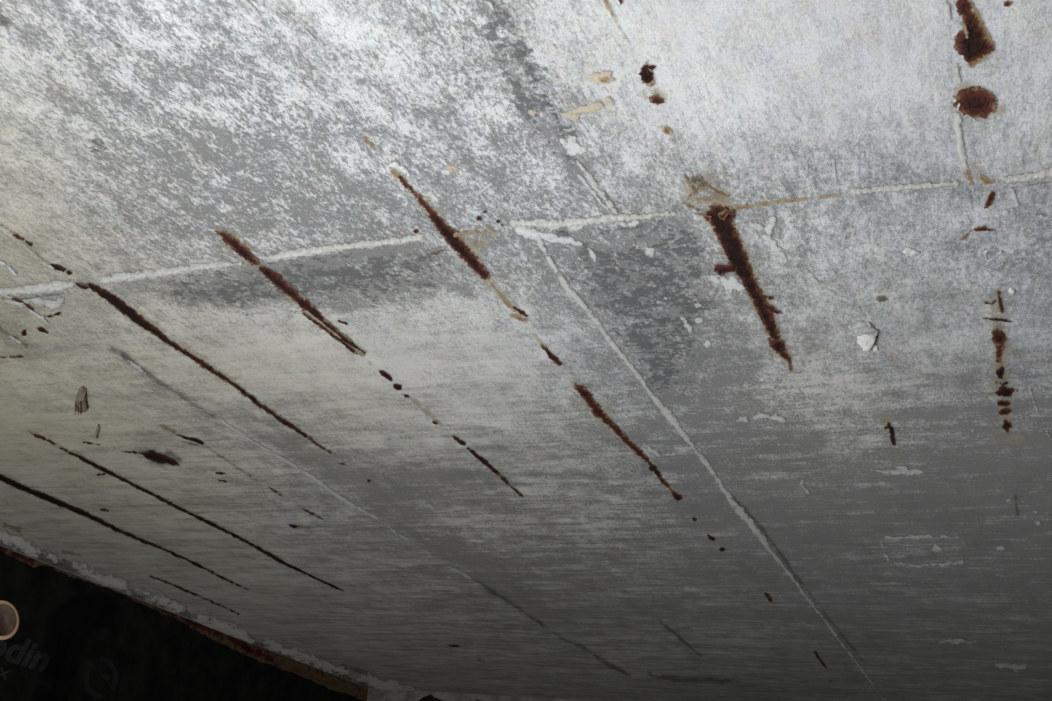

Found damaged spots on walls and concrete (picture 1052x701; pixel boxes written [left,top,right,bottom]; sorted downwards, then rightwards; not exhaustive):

corrosion [953,0,995,68]
corrosion [952,86,997,121]
corrosion [215,230,366,356]
corrosion [387,161,528,322]
corrosion [683,175,840,371]
corrosion [965,170,995,209]
corrosion [379,370,409,398]
corrosion [541,345,562,366]
corrosion [982,291,1017,433]
corrosion [452,436,523,497]
corrosion [574,383,682,502]
corrosion [115,591,368,701]